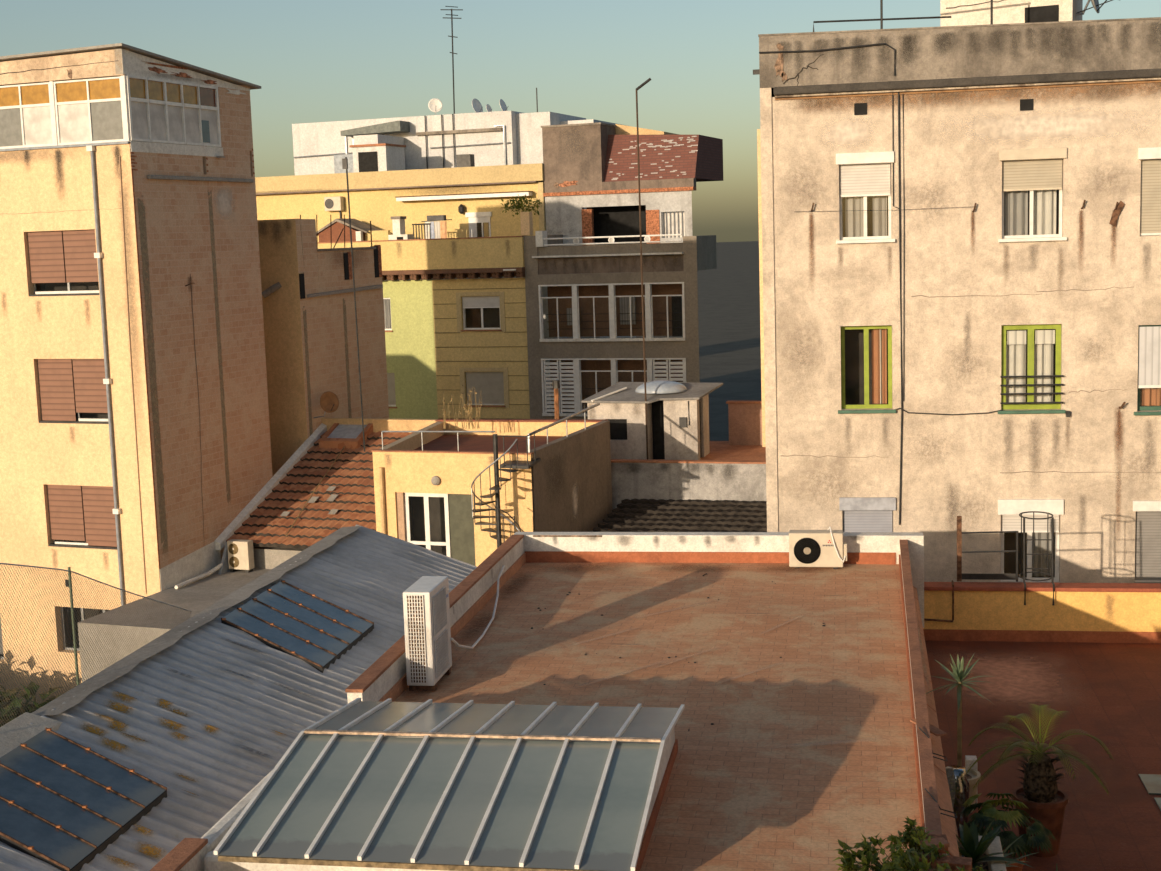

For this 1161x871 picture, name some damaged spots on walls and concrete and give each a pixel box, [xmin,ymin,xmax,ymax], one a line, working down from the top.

crack [783,54,824,86]